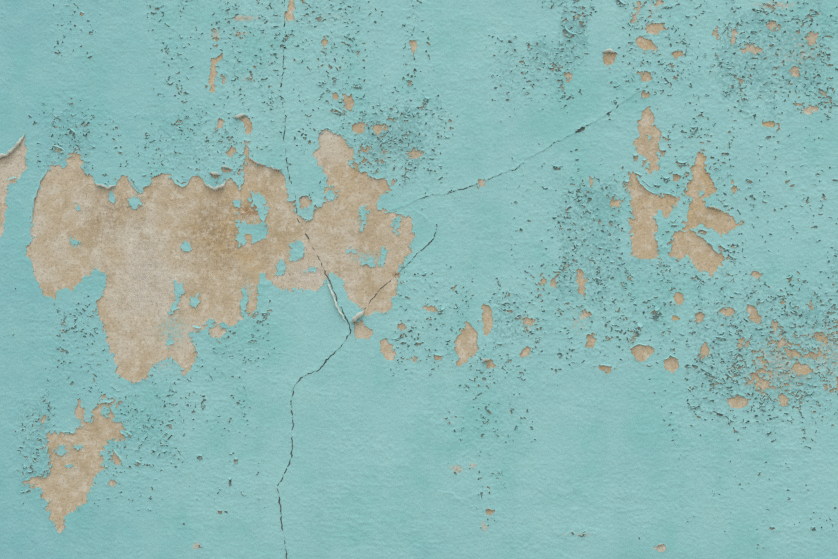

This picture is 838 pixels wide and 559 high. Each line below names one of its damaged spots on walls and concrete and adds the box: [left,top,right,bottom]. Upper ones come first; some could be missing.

peeling [22,363,193,533]
peeling [0,0,453,385]
crack [277,218,437,559]
peeling [380,0,838,436]